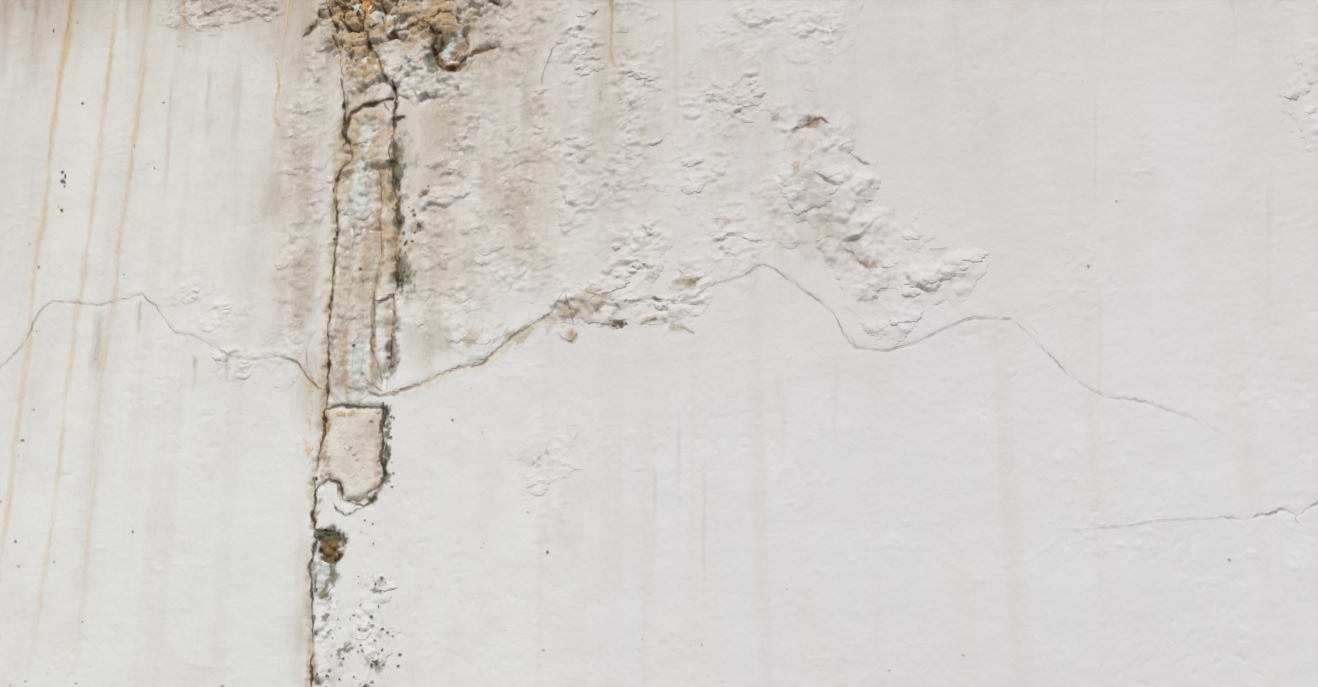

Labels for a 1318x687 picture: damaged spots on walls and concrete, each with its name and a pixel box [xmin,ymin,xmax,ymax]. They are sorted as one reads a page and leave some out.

spalling [310,0,500,109]
water stain [349,123,373,217]
crack [793,116,827,129]
water stain [387,146,429,297]
crack [1,0,577,687]
water stain [386,318,399,367]
crack [610,264,1010,350]
water stain [368,405,395,502]
spalling [308,530,401,687]